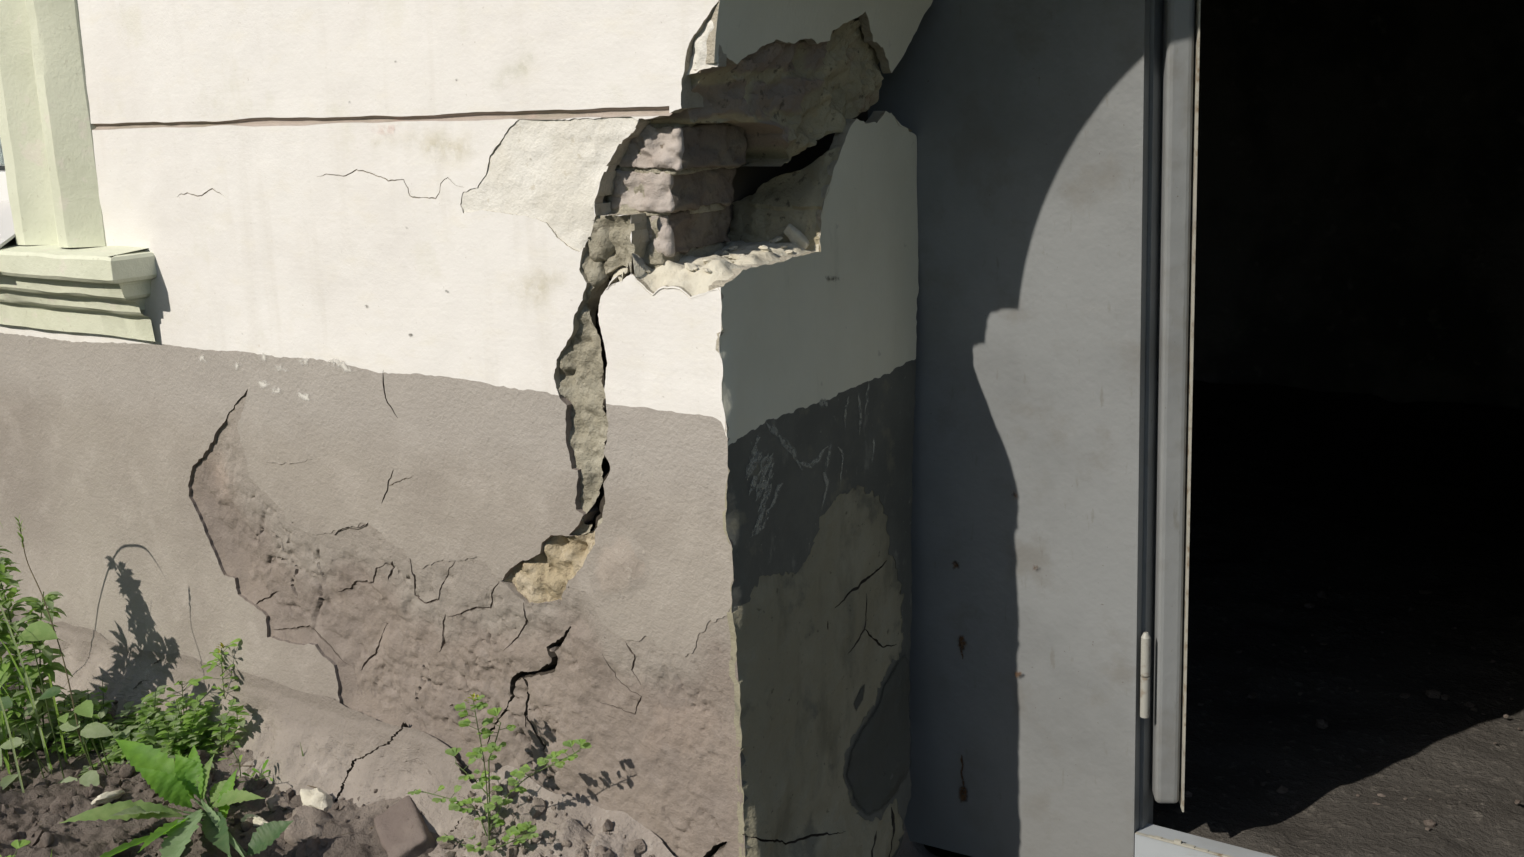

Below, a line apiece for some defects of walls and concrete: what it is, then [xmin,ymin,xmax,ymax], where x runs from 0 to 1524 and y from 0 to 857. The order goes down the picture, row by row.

crack [317,169,460,199]
spalling [461,17,884,288]
crack [335,471,411,535]
water stain [746,424,843,534]
crack [256,591,388,669]
crack [338,560,571,766]
spalling [191,354,905,857]
crack [598,642,642,715]
crack [827,560,896,652]
crack [334,722,409,802]
water stain [846,656,911,814]